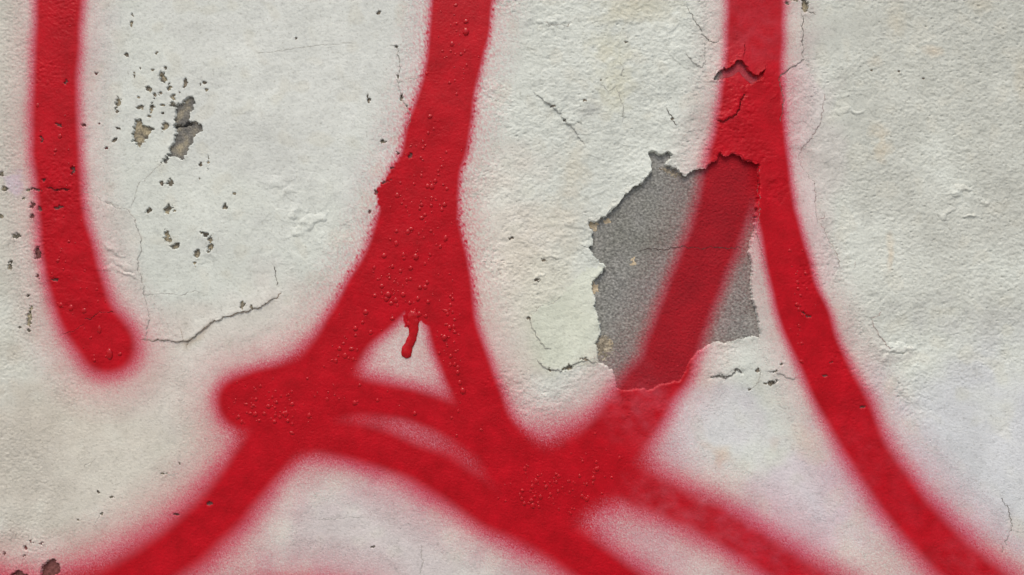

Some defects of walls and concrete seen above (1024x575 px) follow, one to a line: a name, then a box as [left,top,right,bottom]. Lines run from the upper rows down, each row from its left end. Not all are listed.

flaking render [132,67,209,163]
flaking render [22,178,64,220]
crack [33,164,281,347]
flaking render [194,231,214,267]
peeling [548,149,760,372]